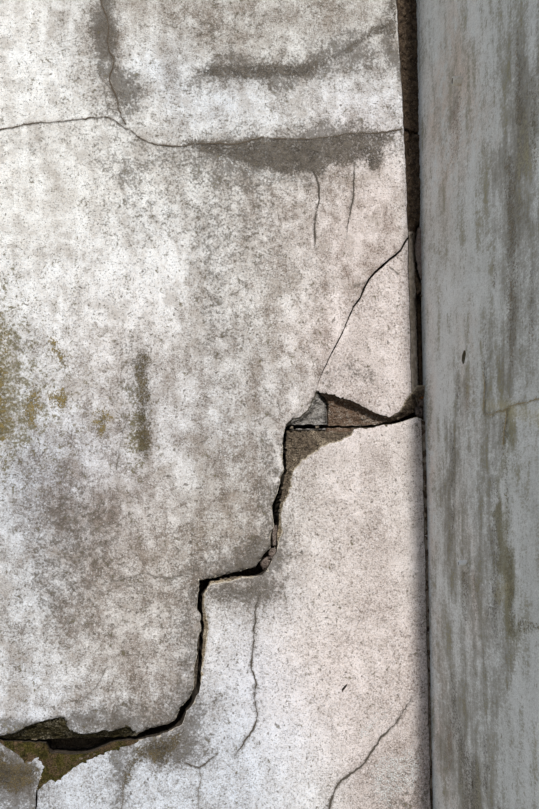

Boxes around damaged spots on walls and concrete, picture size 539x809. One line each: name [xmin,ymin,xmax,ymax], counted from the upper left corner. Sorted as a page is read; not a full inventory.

crack [0,0,402,147]
damp [183,130,395,175]
crack [317,211,422,386]
damp [493,156,519,362]
flaking render [281,391,393,501]
crack [0,385,426,809]